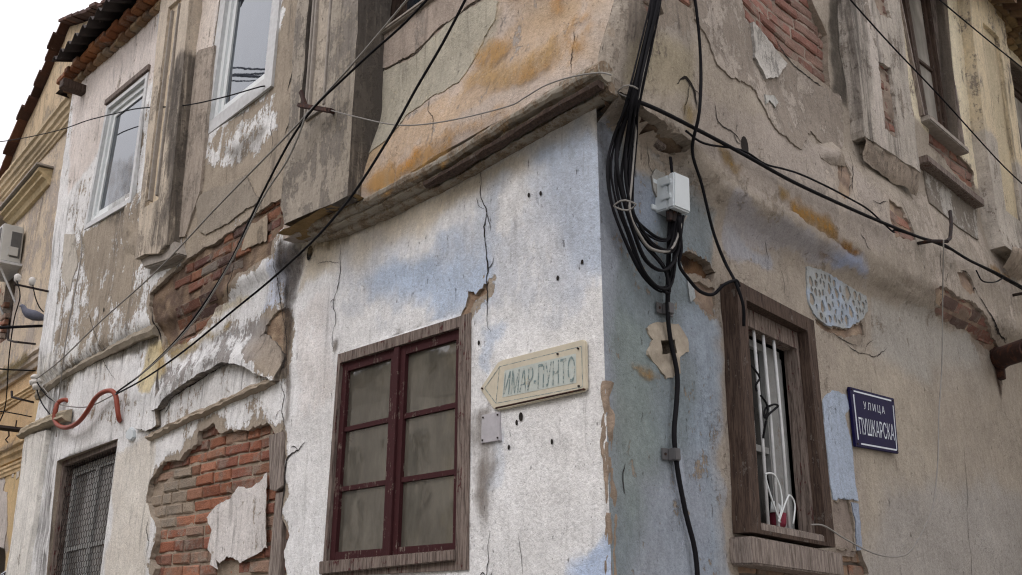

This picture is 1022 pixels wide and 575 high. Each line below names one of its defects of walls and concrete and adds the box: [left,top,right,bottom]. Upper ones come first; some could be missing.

flaking render [679,0,844,150]
spalling [879,65,895,137]
flaking render [152,175,284,347]
crack [477,173,494,330]
spalling [645,322,689,379]
flaking render [681,255,713,316]
flaking render [935,271,995,351]
flaking render [151,425,278,575]
flaking render [822,390,864,575]